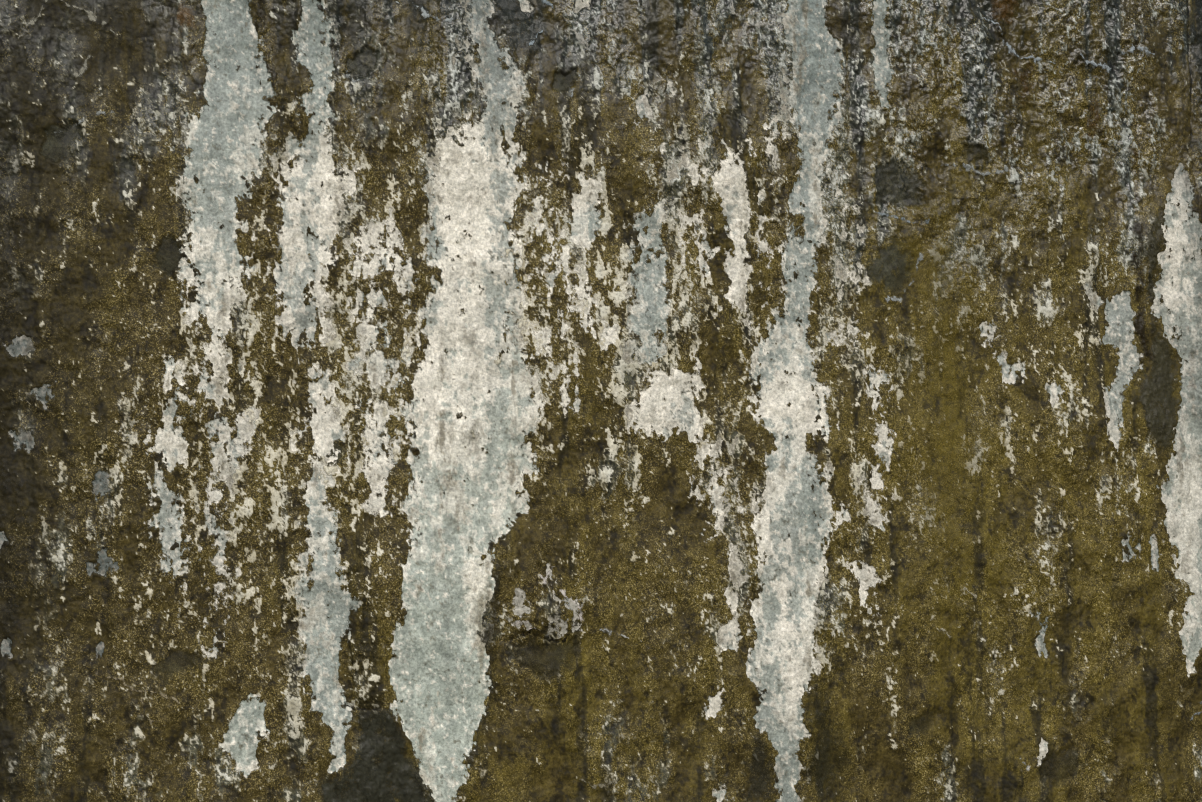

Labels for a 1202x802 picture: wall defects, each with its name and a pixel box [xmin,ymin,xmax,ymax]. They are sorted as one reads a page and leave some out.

peeling [518,0,534,16]
peeling [634,88,654,126]
peeling [339,207,418,517]
peeling [523,115,790,652]
peeling [824,318,897,531]
peeling [155,406,260,684]
spalling [508,563,583,680]
peeling [845,560,885,625]
peeling [1121,530,1162,572]
peeling [219,693,270,778]
peeling [704,686,725,719]
peeling [712,783,728,802]